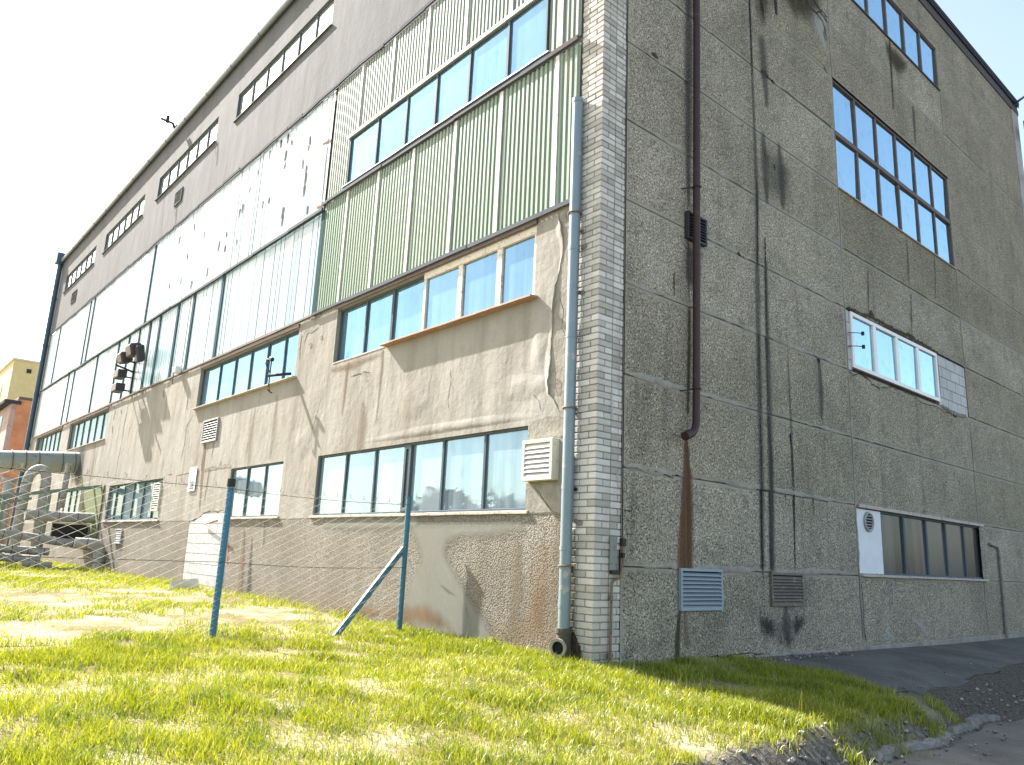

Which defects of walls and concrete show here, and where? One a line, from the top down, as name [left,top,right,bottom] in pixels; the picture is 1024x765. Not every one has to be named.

damp [749,0,829,578]
crack [849,371,952,415]
rust [679,441,693,577]
damp [760,606,805,645]